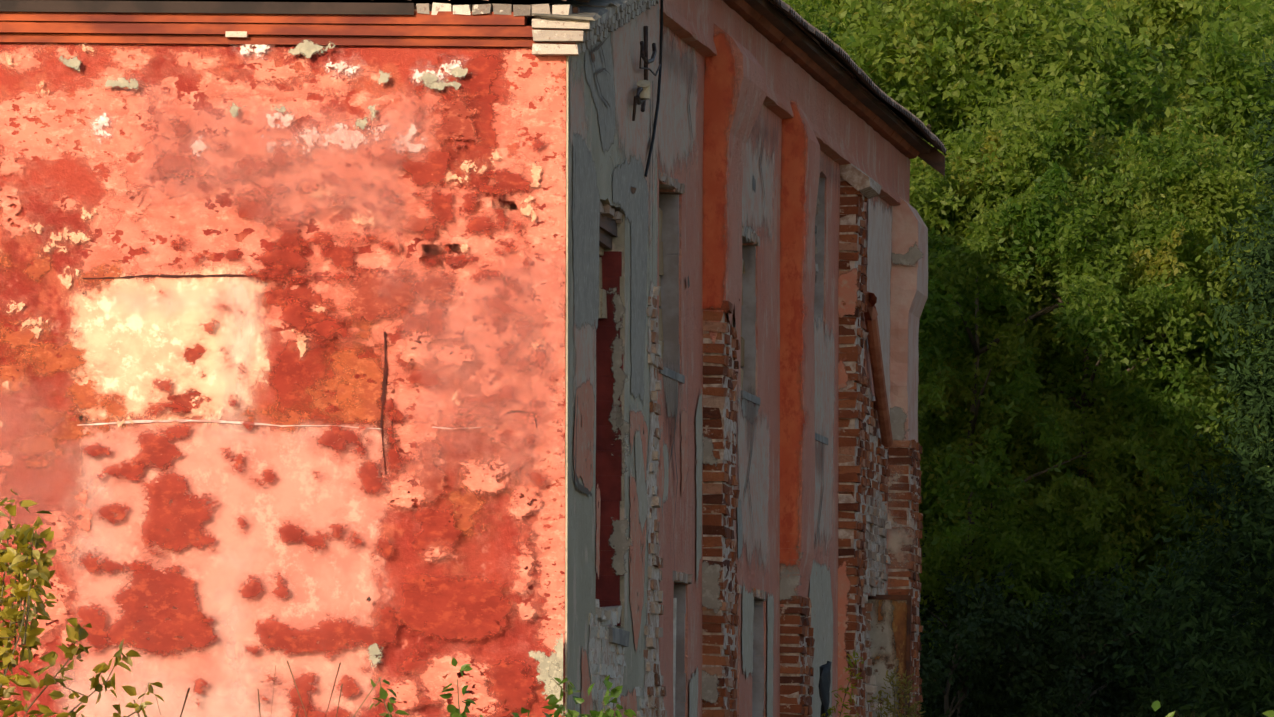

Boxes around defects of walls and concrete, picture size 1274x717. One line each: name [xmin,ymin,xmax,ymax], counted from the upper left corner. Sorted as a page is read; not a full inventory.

flaking render [0,2,735,717]
peeling [737,102,924,717]